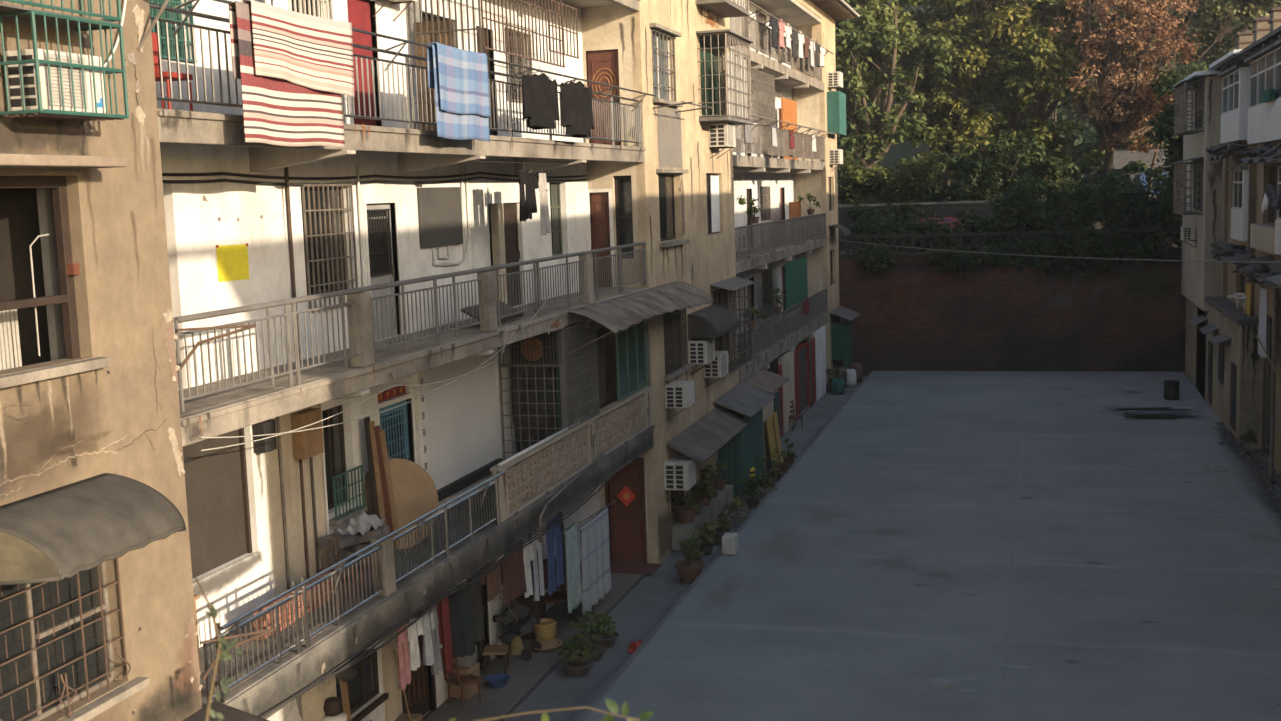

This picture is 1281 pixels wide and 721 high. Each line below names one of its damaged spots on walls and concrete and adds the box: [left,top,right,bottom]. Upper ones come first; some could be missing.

flaking render [125,4,146,124]
crack [0,328,168,496]